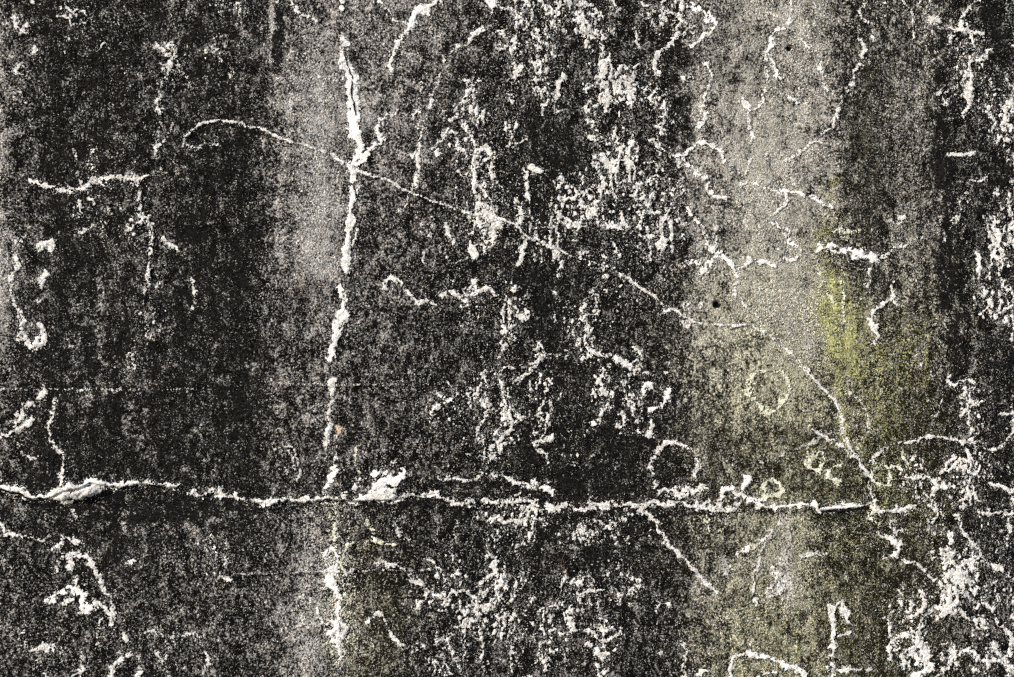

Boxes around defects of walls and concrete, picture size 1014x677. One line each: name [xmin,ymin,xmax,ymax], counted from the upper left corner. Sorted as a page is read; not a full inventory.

crack [28,166,167,196]
crack [182,22,702,325]
crack [670,0,877,327]
water stain [0,0,363,677]
crack [325,284,349,363]
water stain [377,0,1014,601]
crack [0,296,1014,606]
crack [89,562,131,650]
crack [365,611,425,650]
crack [374,558,488,628]
crack [901,558,957,622]
water stain [934,641,1014,677]